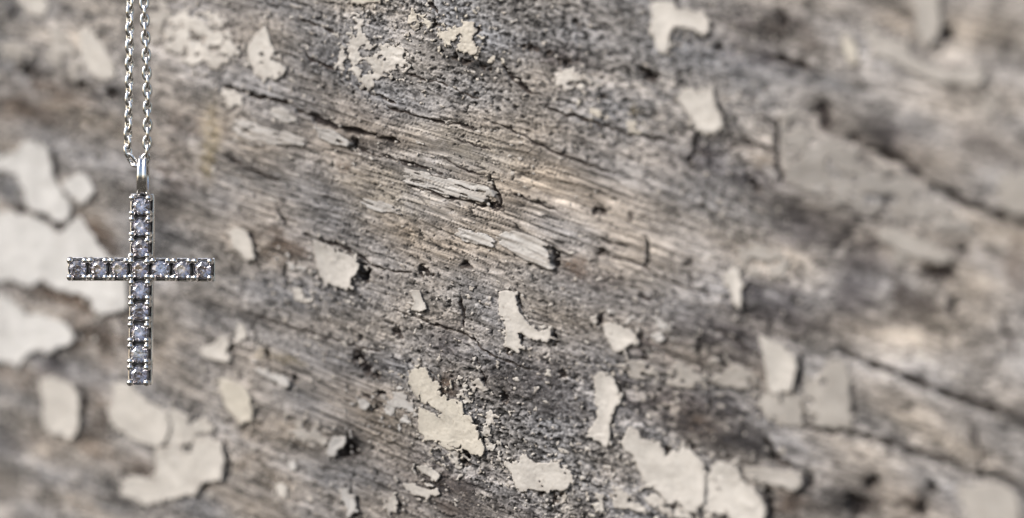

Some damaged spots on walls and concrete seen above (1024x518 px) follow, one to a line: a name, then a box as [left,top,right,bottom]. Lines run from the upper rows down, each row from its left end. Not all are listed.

peeling [147,0,294,121]
peeling [227,223,256,261]
peeling [275,229,373,309]
peeling [334,0,653,138]
crack [222,51,784,211]
peeling [640,0,711,60]
peeling [671,76,733,146]
peeling [777,95,981,270]
peeling [107,323,353,513]
crack [395,299,534,385]
peeling [349,286,858,518]
peeling [956,472,1022,518]